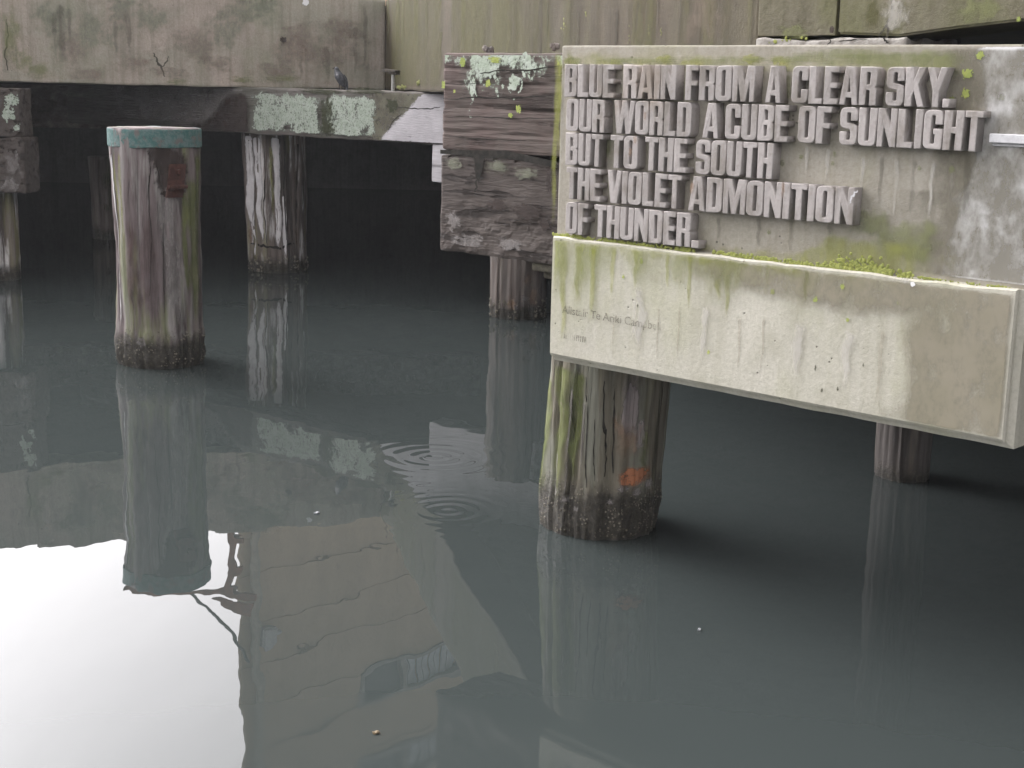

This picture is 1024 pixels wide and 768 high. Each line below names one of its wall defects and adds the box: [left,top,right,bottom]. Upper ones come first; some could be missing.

crack [153,53,169,77]
water stain [696,47,1024,436]